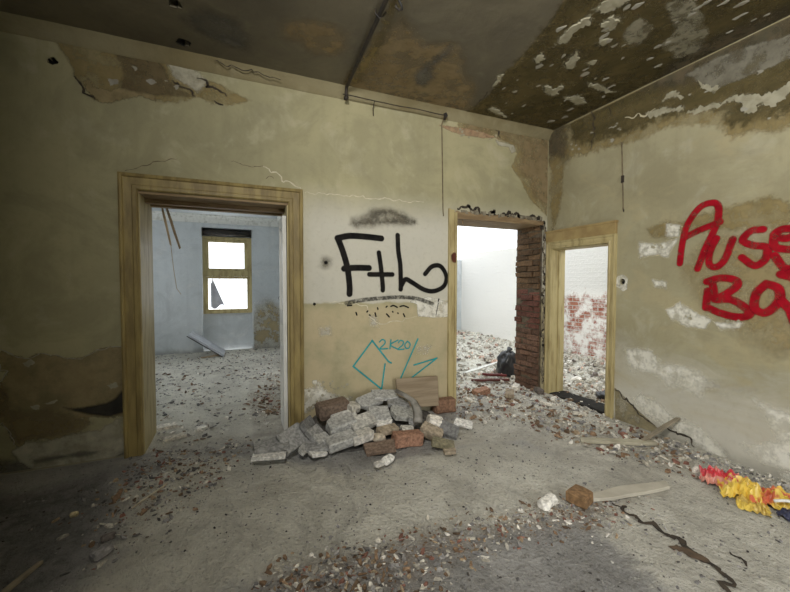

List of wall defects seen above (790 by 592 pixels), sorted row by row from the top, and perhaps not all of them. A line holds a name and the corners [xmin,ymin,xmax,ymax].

damp [346,0,790,225]
crack [231,161,421,203]
peeling [353,297,448,324]
peeling [0,346,124,469]
crack [610,501,748,592]